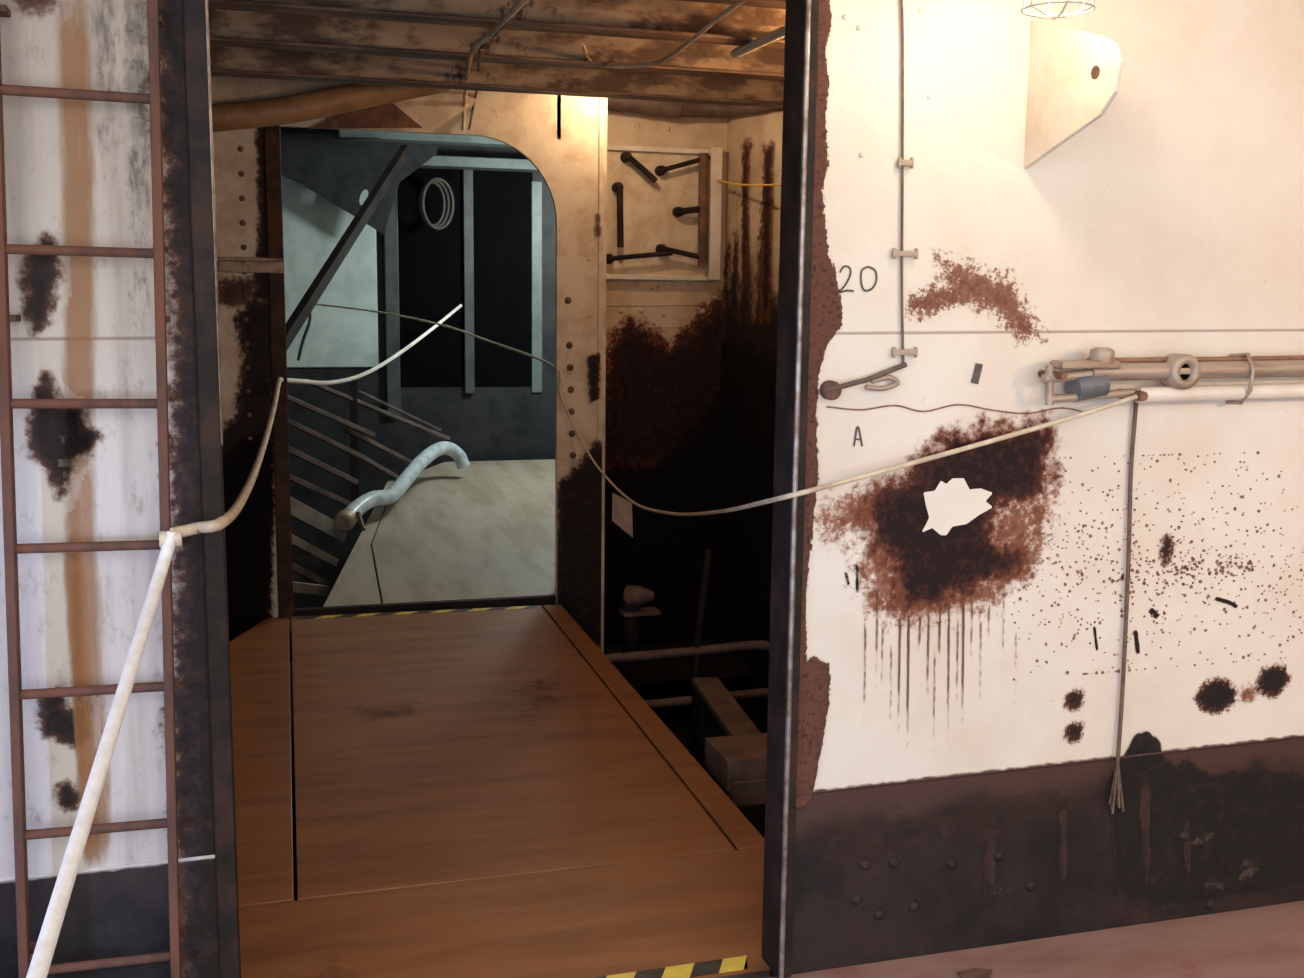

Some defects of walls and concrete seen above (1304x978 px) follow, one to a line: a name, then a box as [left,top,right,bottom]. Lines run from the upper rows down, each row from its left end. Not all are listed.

rust [13,0,107,860]
rust [143,0,220,978]
rust [557,140,778,733]
rust [796,0,843,809]
peeling [922,478,992,535]
rust [905,250,1048,348]
rust [1011,451,1304,744]